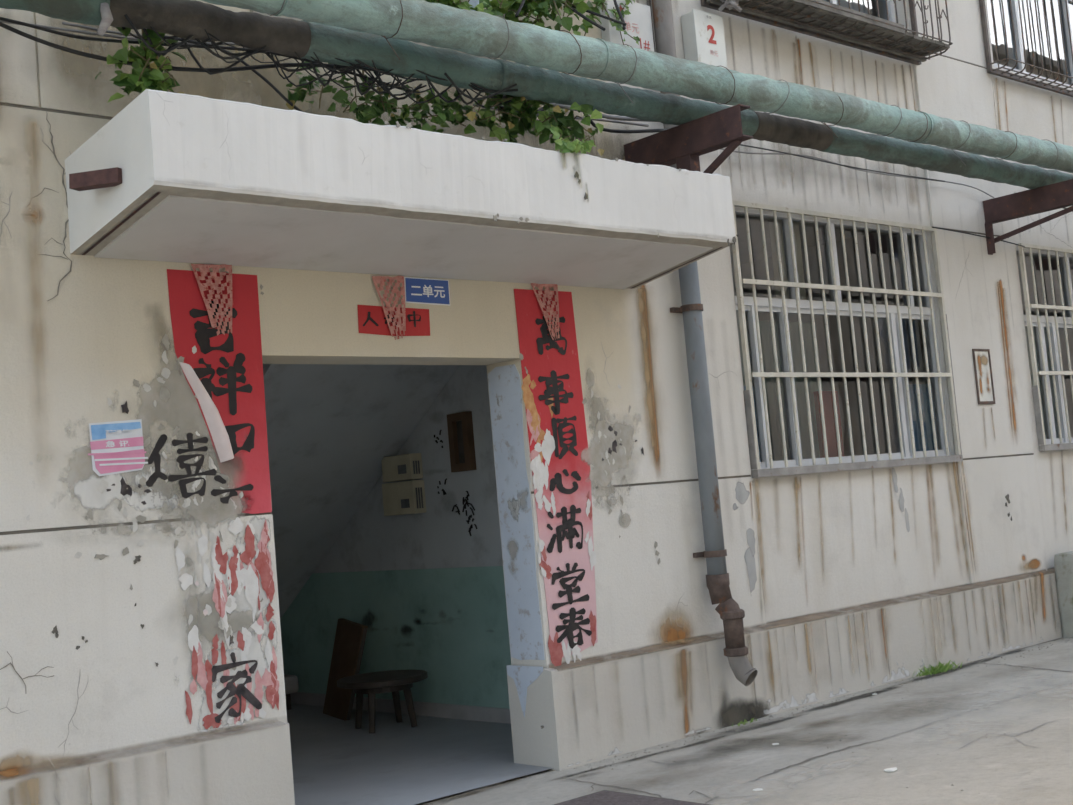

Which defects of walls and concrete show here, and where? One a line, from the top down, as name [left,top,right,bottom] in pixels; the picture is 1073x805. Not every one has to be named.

crack [0,109,72,301]
peeling [67,331,247,564]
peeling [581,370,644,538]
corrosion [638,285,659,464]
corrosion [953,462,974,564]
corrosion [998,280,1016,430]
corrosion [1022,556,1046,619]
crack [0,652,88,805]
corrosion [660,616,693,734]